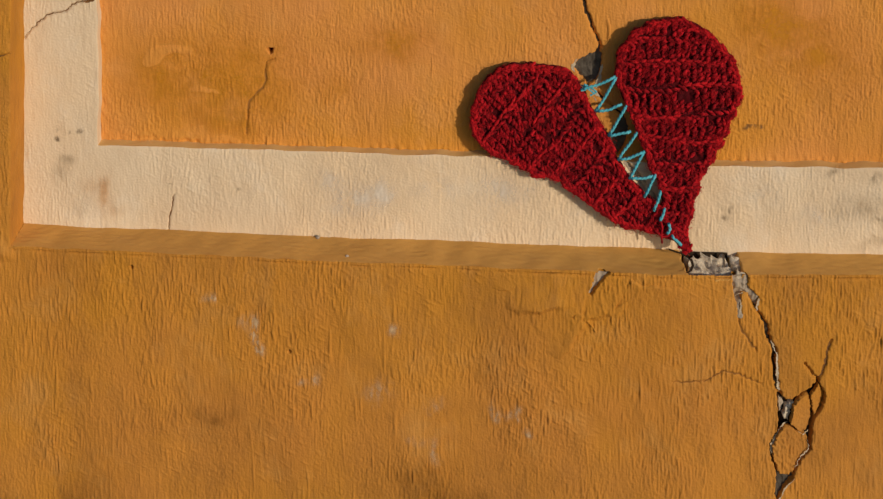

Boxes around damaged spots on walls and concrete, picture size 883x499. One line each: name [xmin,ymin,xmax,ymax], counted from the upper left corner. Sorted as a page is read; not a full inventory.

crack [25,0,94,37]
crack [246,59,273,133]
crack [571,0,657,201]
peeling [681,251,727,263]
crack [675,270,831,499]